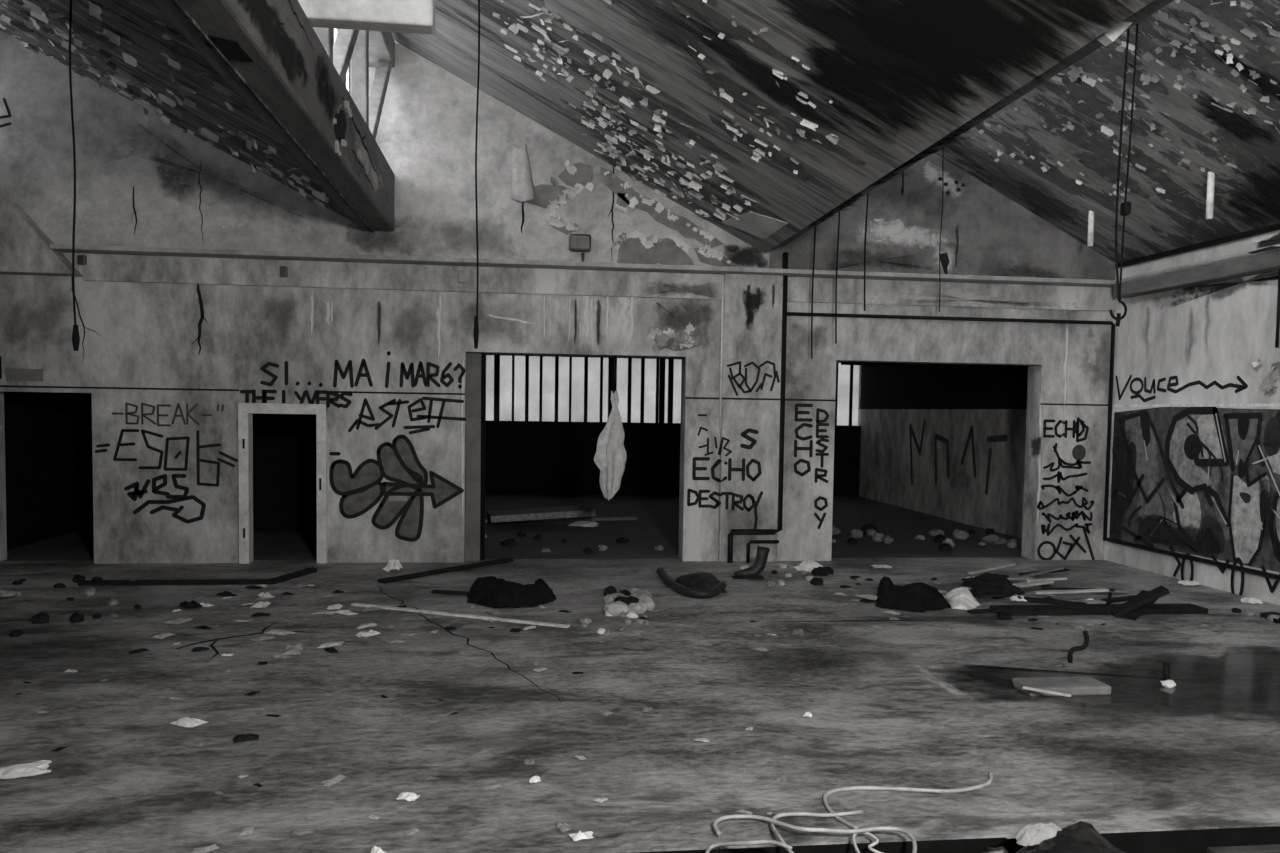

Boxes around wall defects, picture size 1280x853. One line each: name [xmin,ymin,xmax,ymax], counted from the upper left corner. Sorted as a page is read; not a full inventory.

peeling [0,0,368,220]
leakage [238,0,335,120]
peeling [477,0,866,267]
peeling [968,0,1280,202]
crack [196,166,204,238]
crack [192,284,208,355]
spalling [1251,359,1280,396]